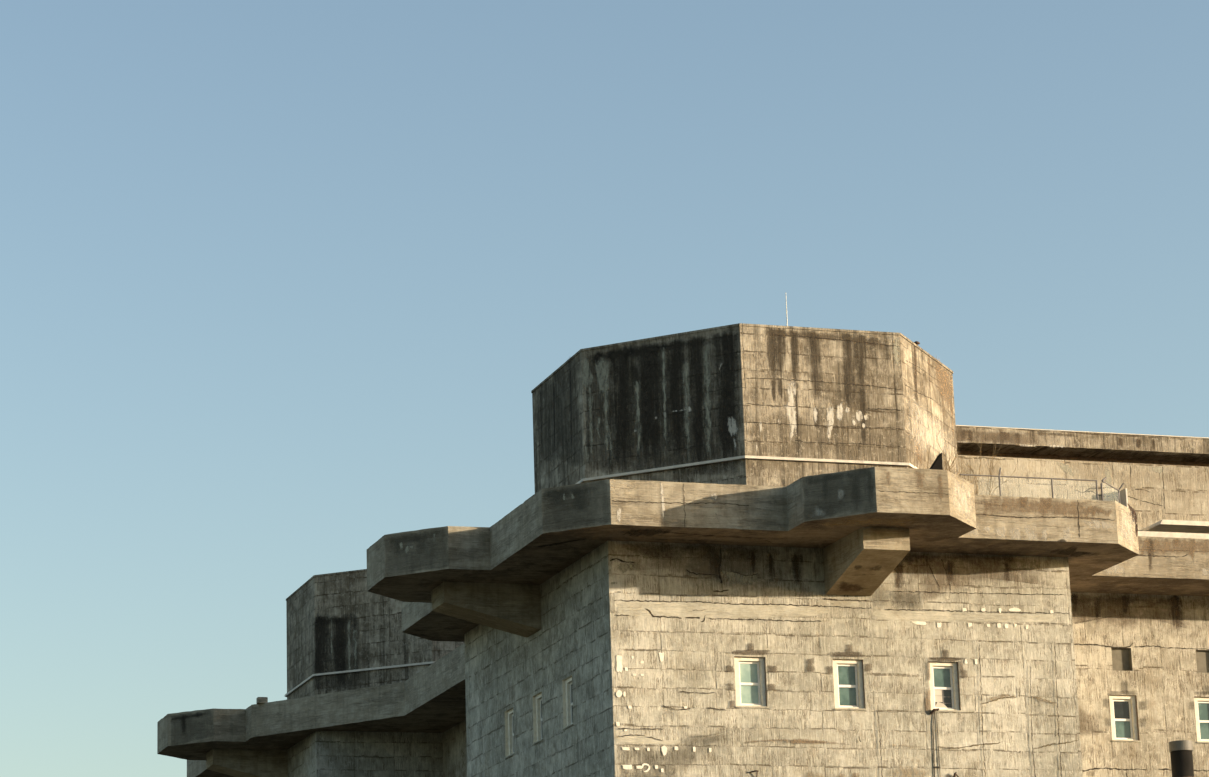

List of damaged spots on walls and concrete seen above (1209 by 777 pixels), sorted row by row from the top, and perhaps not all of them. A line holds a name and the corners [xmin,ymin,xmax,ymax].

water stain [538,334,739,471]
water stain [768,327,1071,448]
water stain [617,484,672,565]
crack [615,549,1069,622]
water stain [896,554,1032,588]
water stain [1071,595,1182,628]
water stain [315,616,358,687]